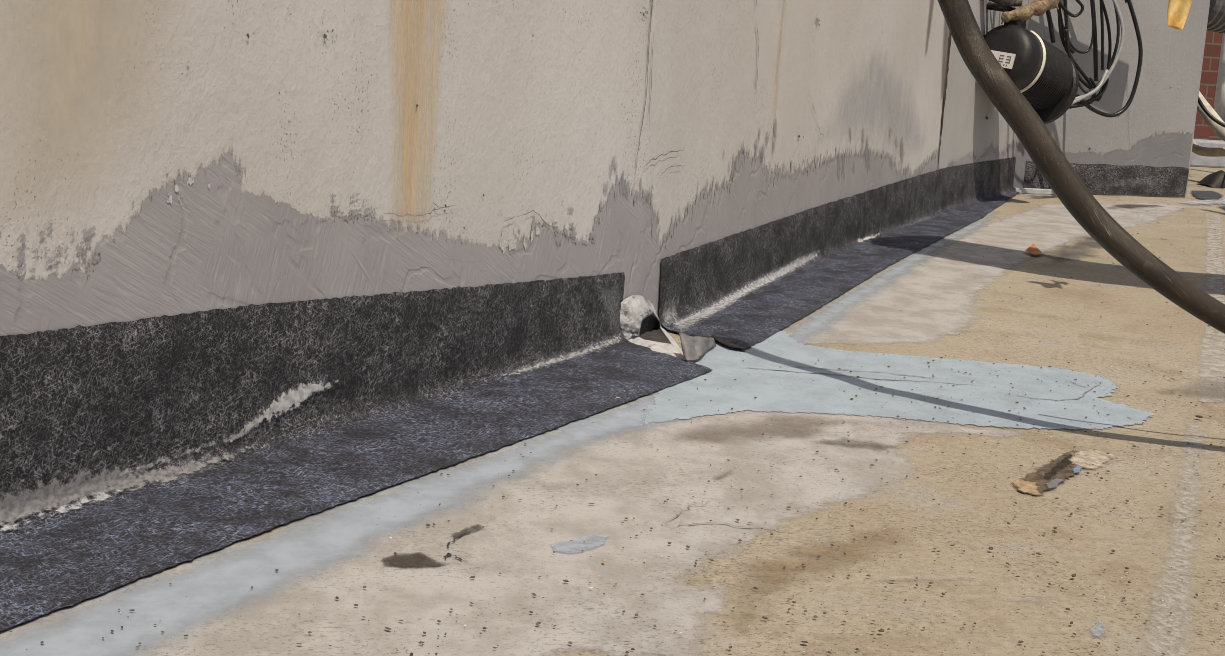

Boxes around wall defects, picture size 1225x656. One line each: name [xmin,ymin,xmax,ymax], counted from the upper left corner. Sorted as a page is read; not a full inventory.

crack [634,0,682,190]